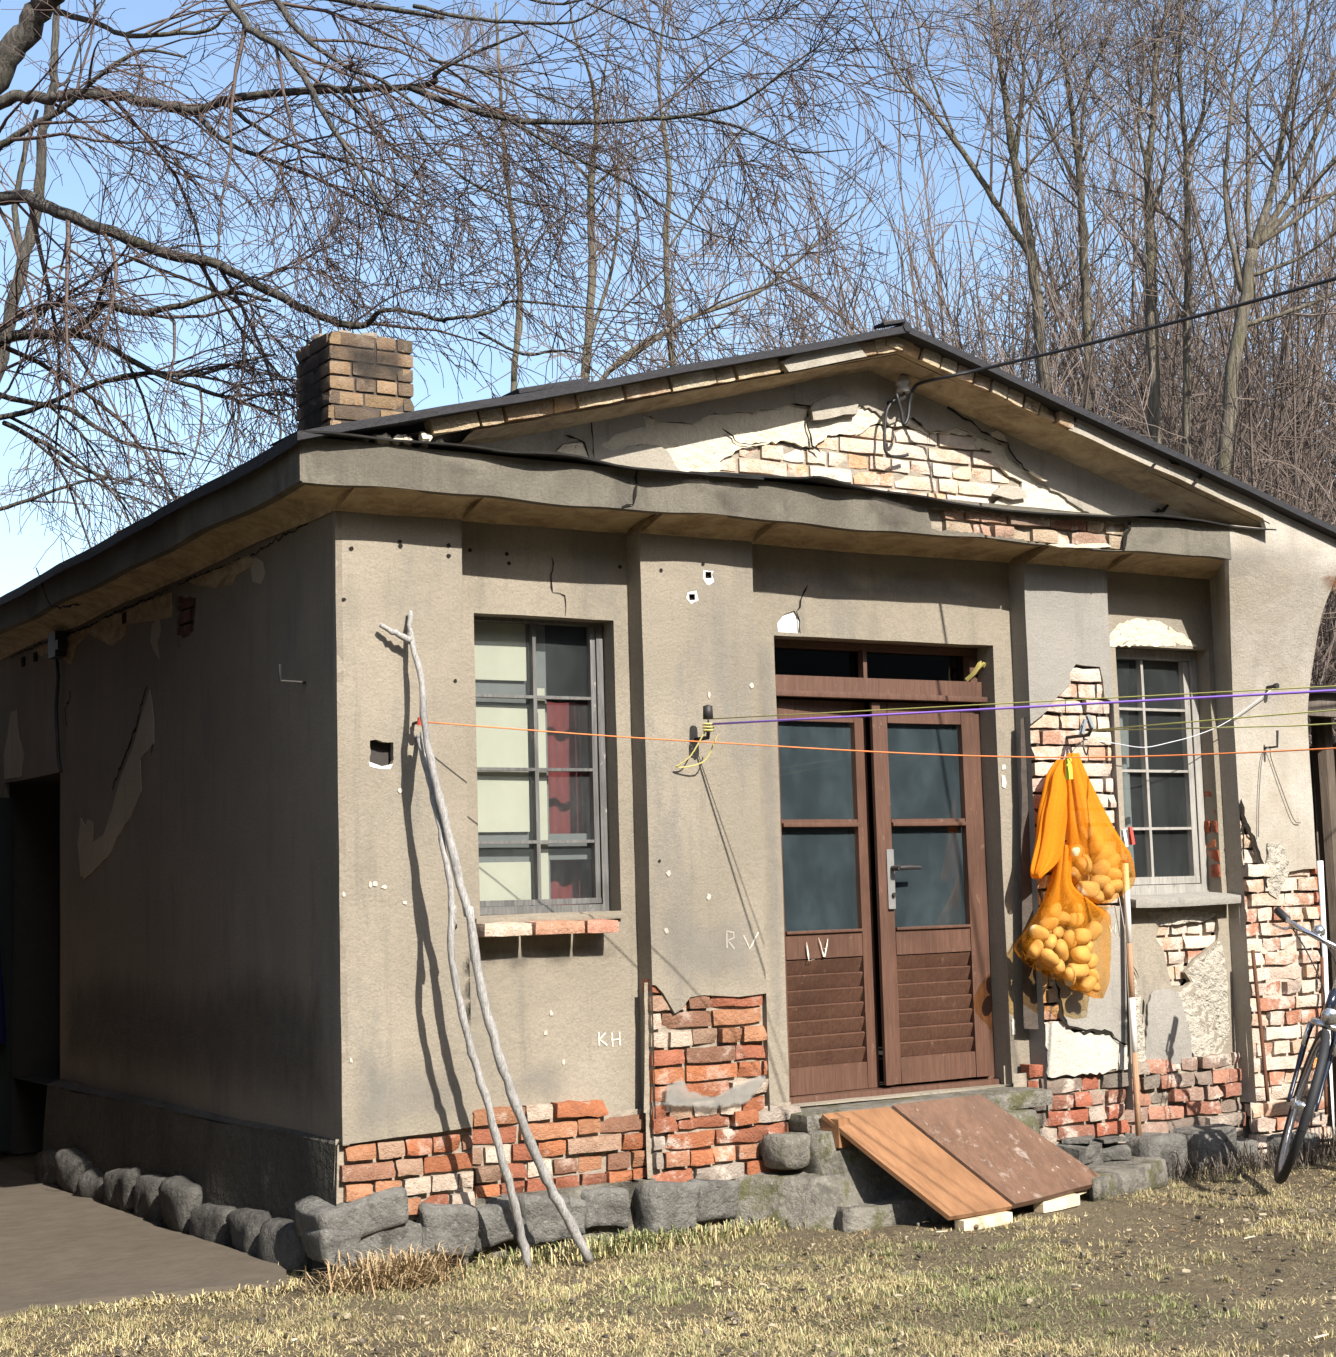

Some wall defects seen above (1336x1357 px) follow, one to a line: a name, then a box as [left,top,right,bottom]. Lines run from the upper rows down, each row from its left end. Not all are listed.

flaking render [556,443,588,457]
flaking render [601,394,1124,550]
crack [912,406,1030,472]
crack [550,559,566,615]
flaking render [1014,665,1332,1164]
flaking render [334,979,801,1220]